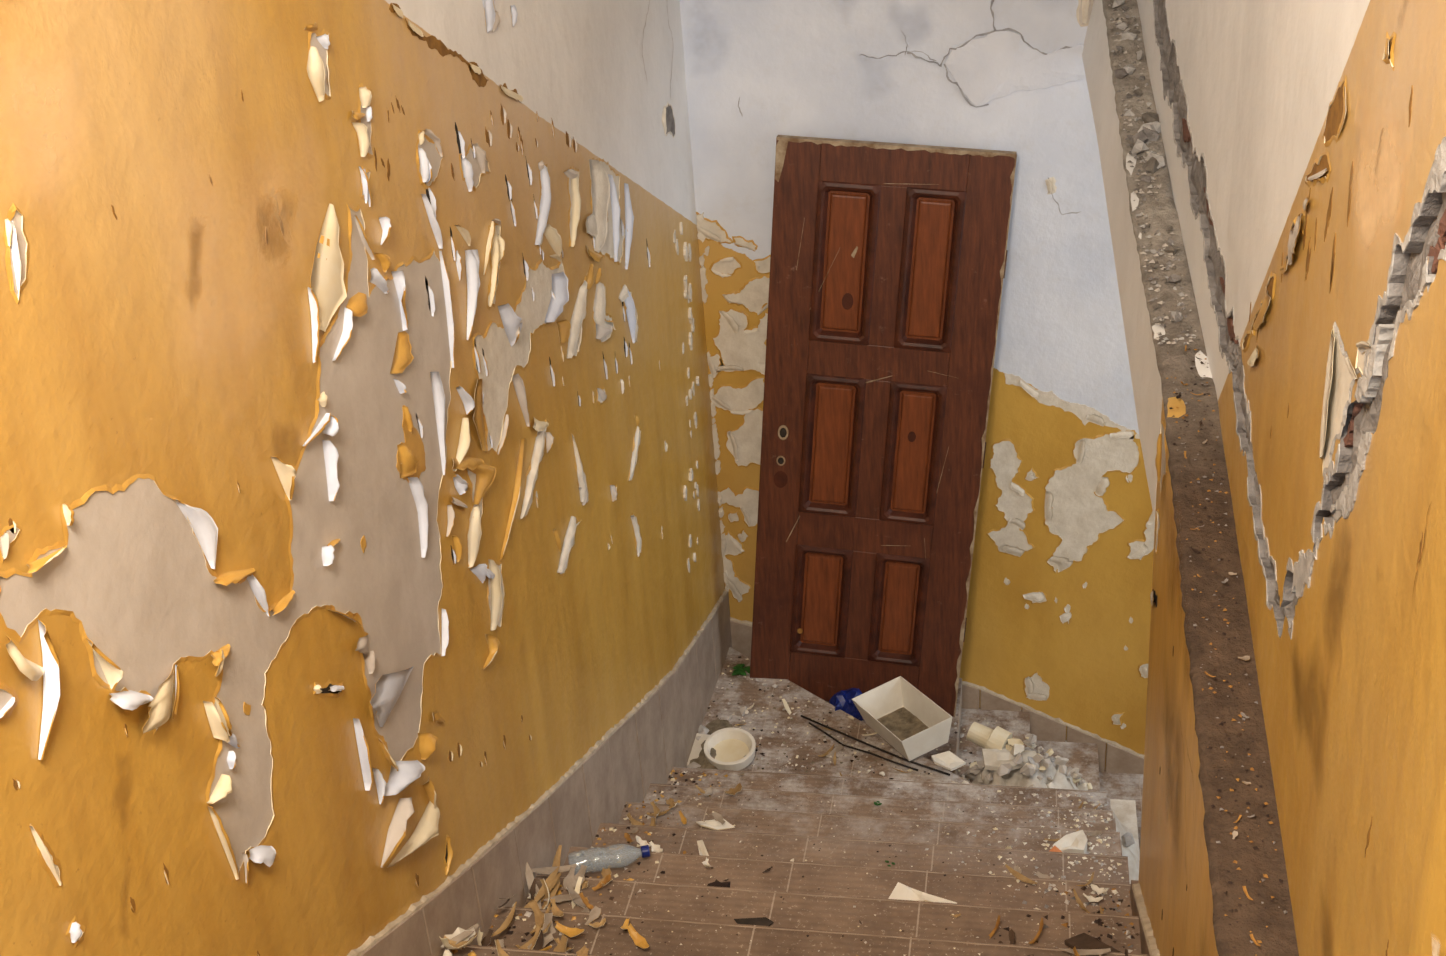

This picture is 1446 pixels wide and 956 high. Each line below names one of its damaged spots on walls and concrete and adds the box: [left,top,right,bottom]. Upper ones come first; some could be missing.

flaking render [662,102,675,138]
crack [860,31,936,61]
peeling [0,0,651,888]
peeling [673,212,771,603]
peeling [987,373,1167,574]
peeling [1241,75,1353,367]
crack [1153,0,1446,639]
peeling [1004,578,1072,625]
peeling [591,798,687,853]